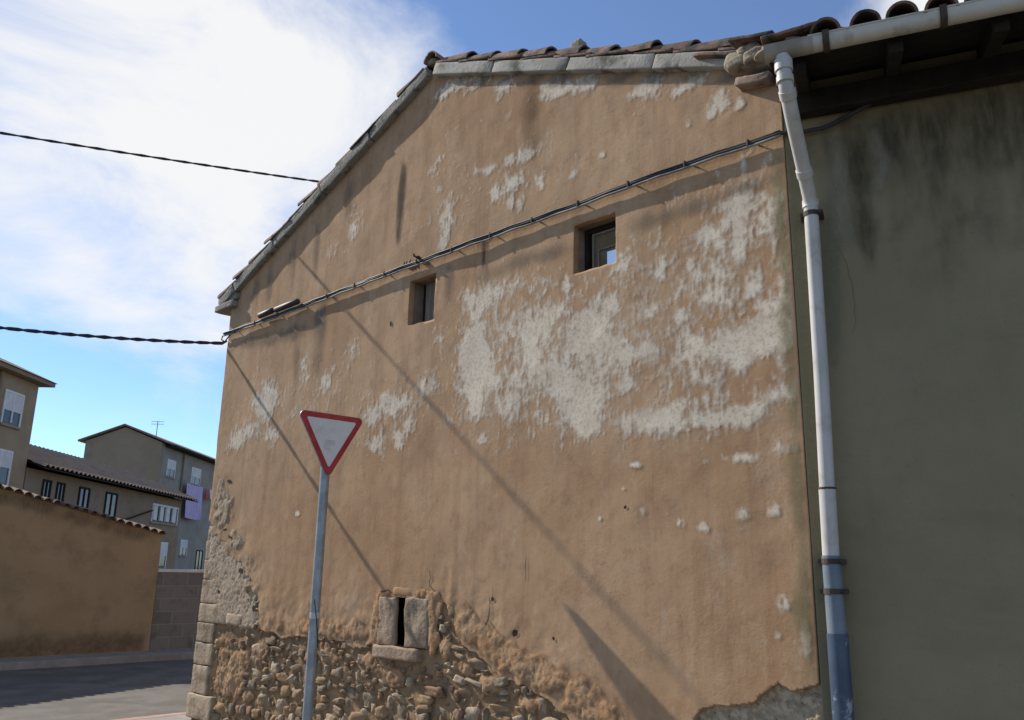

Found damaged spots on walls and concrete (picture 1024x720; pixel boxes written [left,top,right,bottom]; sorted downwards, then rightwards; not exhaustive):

peeling [435,75,515,101]
peeling [528,73,598,101]
peeling [628,72,710,100]
peeling [429,155,458,250]
peeling [448,148,796,447]
peeling [300,356,335,406]
peeling [227,379,294,450]
peeling [359,370,436,454]
peeling [733,453,758,462]
flaking render [194,478,626,720]
spalling [697,684,823,720]